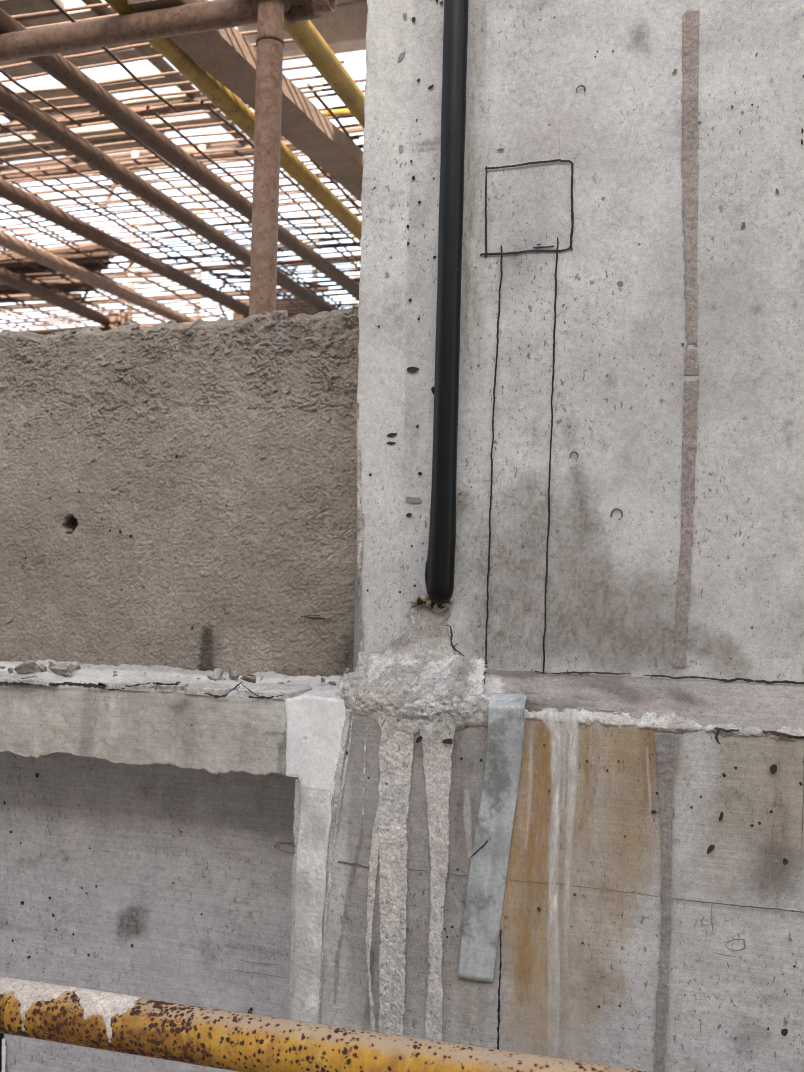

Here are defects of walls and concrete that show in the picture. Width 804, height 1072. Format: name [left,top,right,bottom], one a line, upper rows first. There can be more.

spalling [0,675,59,687]
peeling [98,403,492,1024]
crack [534,671,804,685]
crack [714,727,804,841]
crack [338,860,369,868]
leakage [365,798,379,1032]
rust [503,727,558,1000]
crack [509,879,804,913]